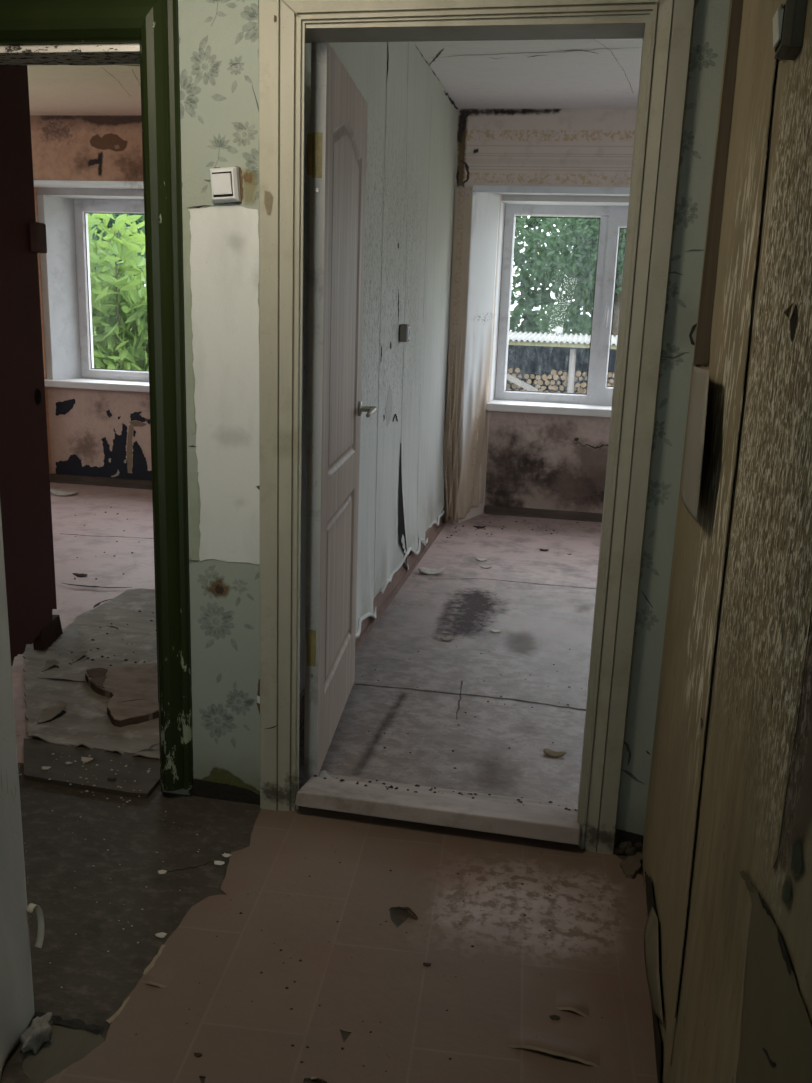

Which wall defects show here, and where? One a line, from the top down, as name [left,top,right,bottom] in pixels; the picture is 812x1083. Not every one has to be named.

crack [416,46,462,110]
crack [489,40,633,92]
peeling [55,399,76,416]
peeling [55,410,152,481]
damp [486,434,605,509]
damp [441,591,496,636]